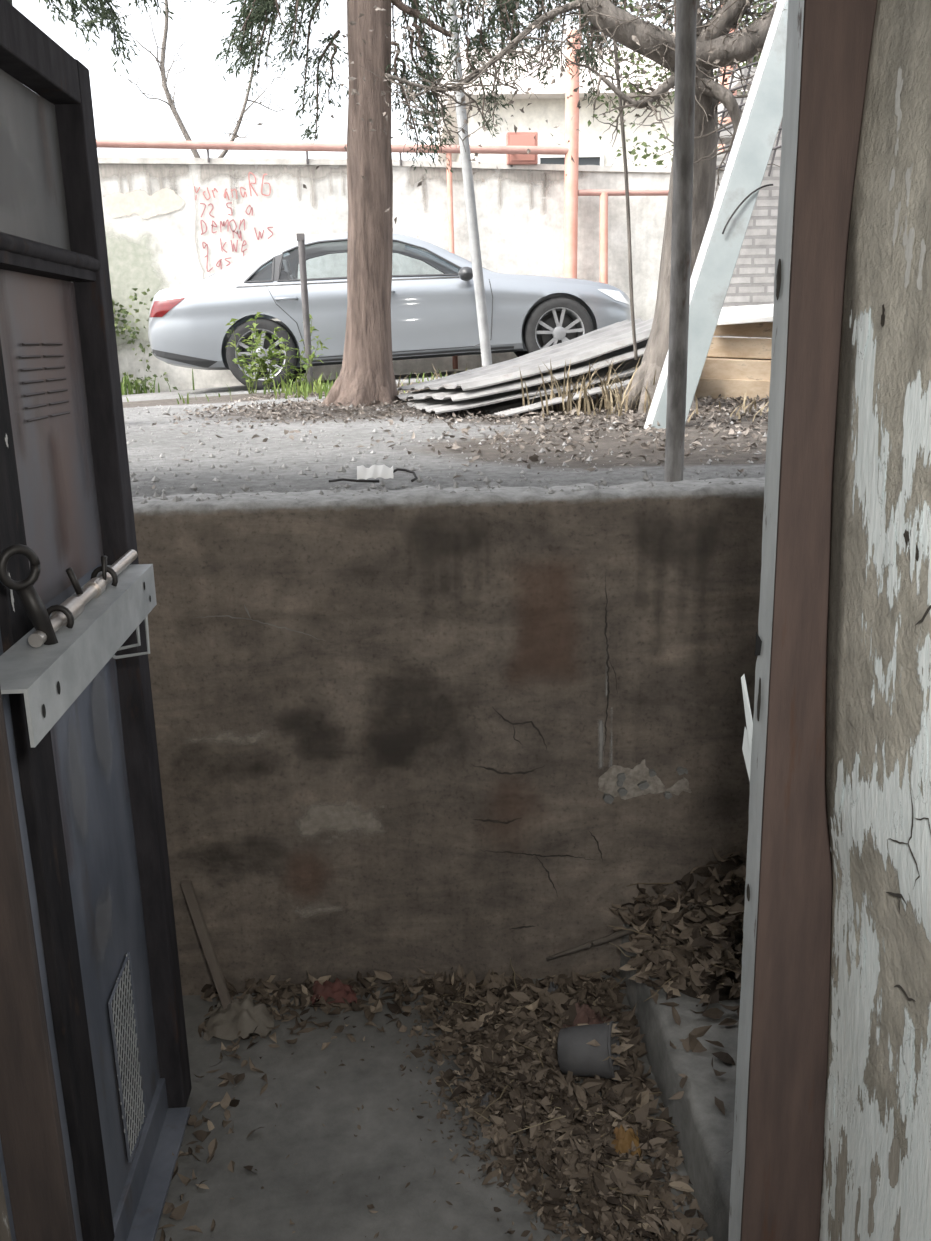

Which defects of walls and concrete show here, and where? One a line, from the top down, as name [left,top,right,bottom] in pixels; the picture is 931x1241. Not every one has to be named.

crack [603,577,618,755]
spalling [597,759,692,804]
peeling [819,305,931,1241]
crack [473,817,603,897]
crack [886,783,931,913]